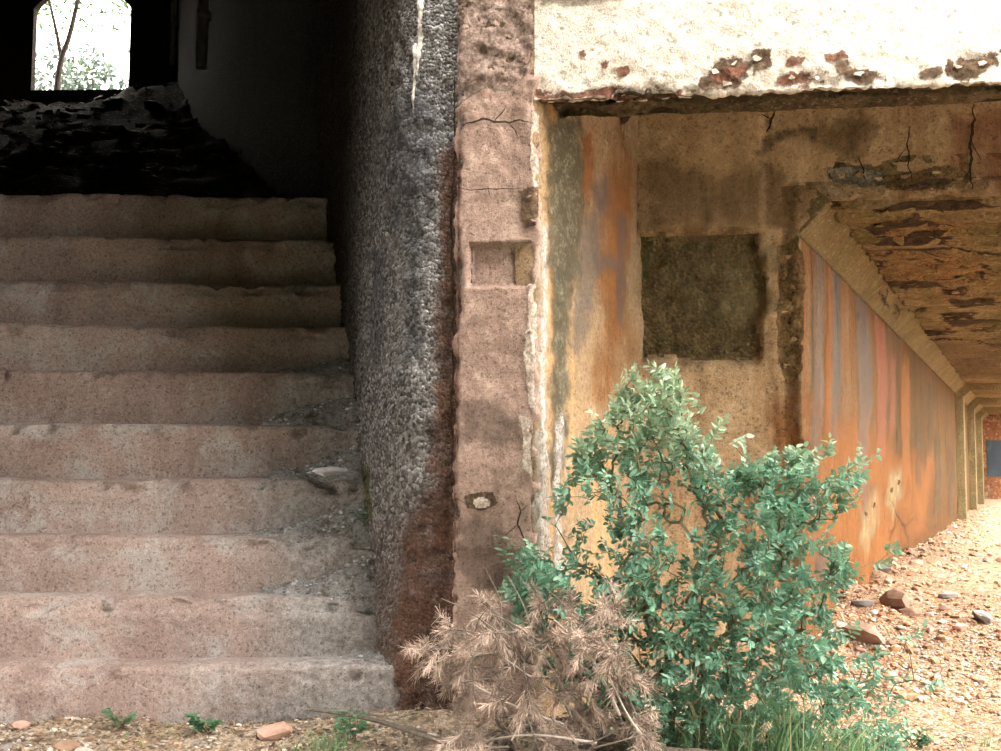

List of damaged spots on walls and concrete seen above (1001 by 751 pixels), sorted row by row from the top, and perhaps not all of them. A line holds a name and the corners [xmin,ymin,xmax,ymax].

leakage [411,0,424,112]
spalling [698,48,772,91]
spalling [777,50,888,89]
spalling [918,48,1001,82]
peeling [520,84,691,231]
crack [896,127,912,182]
crack [963,103,981,190]
crack [440,76,533,504]
rust [601,171,630,345]
spalling [827,165,1001,336]
peeling [518,284,537,477]
leakage [532,227,564,574]